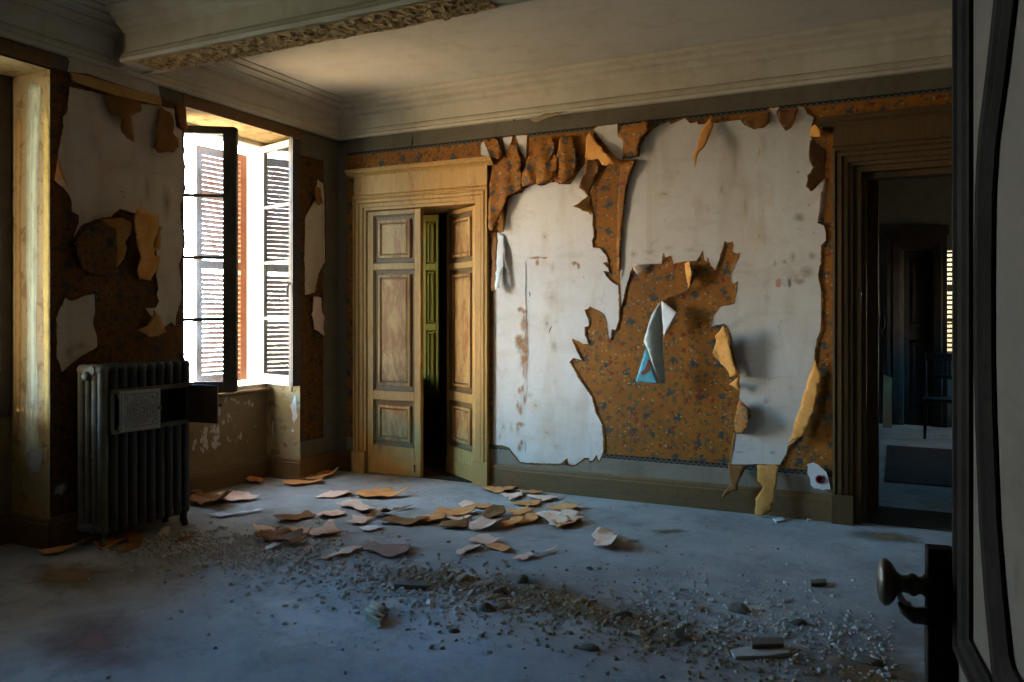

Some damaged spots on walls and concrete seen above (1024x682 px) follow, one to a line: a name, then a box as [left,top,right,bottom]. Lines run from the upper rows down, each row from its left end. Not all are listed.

flaking render [134,0,498,71]
peeling [43,57,188,431]
peeling [303,178,326,335]
peeling [480,106,828,516]
peeling [192,397,254,453]
peeling [290,396,298,432]